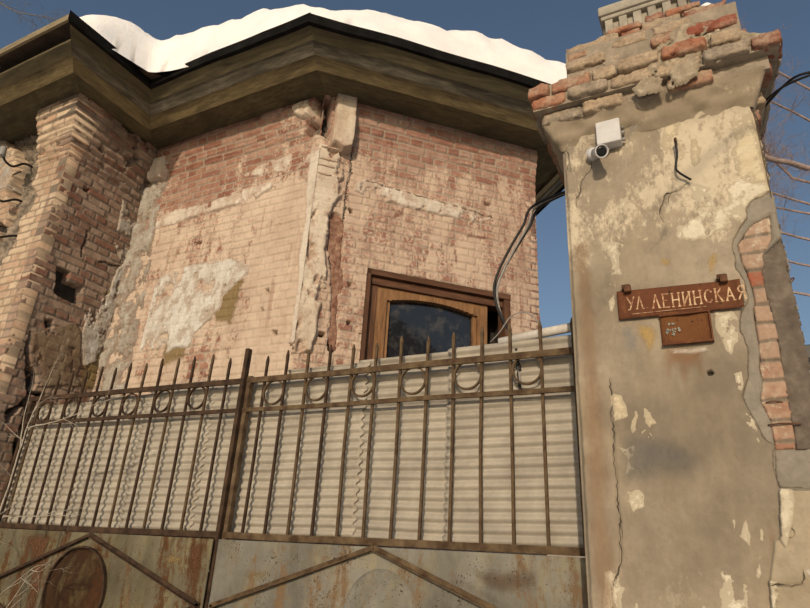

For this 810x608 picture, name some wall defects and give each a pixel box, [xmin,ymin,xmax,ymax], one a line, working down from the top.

crack [342,154,353,223]
crack [566,150,592,205]
peeling [116,199,136,237]
peeling [601,242,624,285]
peeling [24,242,129,388]
peeling [140,259,250,360]
spalling [676,113,810,490]
peeling [610,394,656,439]
peeling [626,490,644,512]
peeling [719,571,748,608]